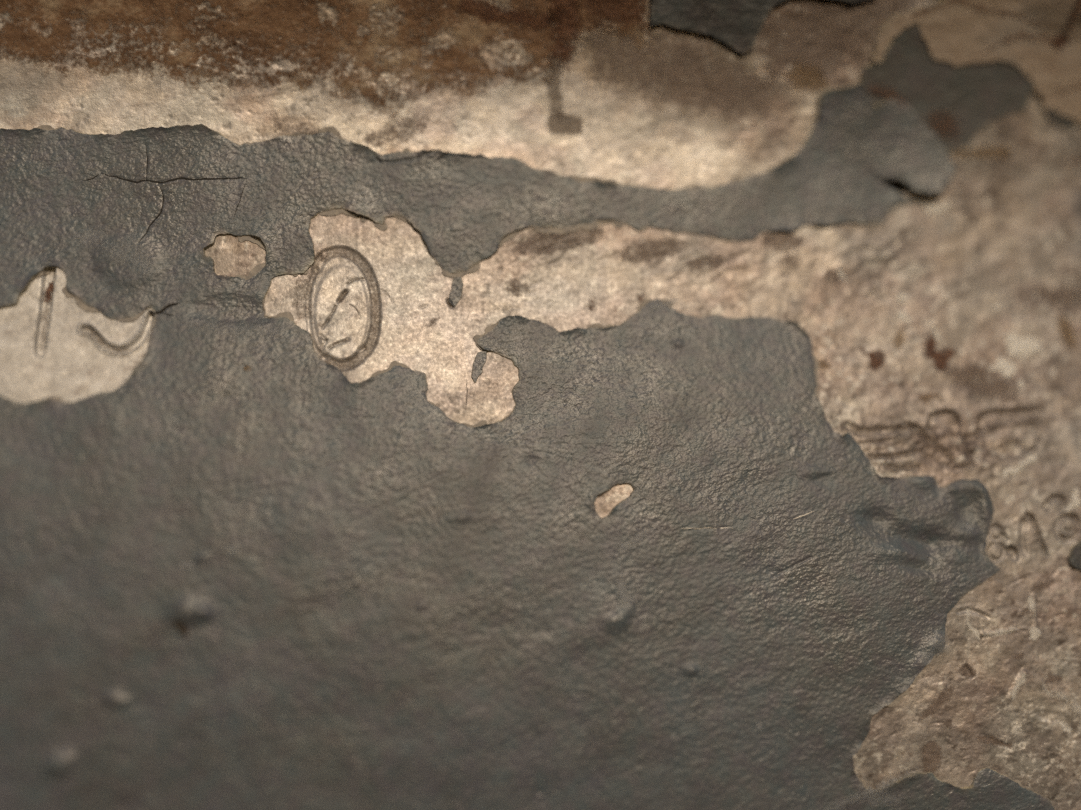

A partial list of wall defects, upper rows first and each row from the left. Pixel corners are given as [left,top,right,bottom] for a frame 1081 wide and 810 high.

peeling [0,0,942,189]
crack [84,147,247,243]
peeling [205,235,266,277]
peeling [0,268,155,403]
peeling [263,90,1081,810]